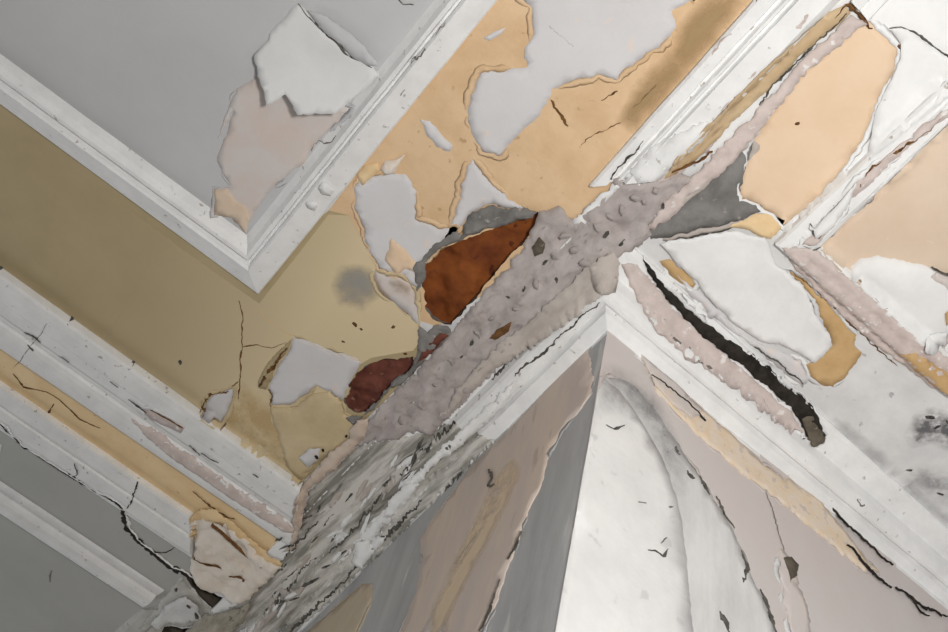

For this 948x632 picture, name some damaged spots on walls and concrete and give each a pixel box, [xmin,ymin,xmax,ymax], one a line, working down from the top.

peeling [209,4,379,234]
spalling [351,0,948,447]
crack [0,422,193,579]
crack [218,302,361,399]
peeling [128,335,595,632]
peeling [554,373,777,632]
crack [643,259,828,448]
peeling [641,354,880,576]
peeling [772,549,811,632]
crack [832,508,948,617]
damp [916,419,948,439]